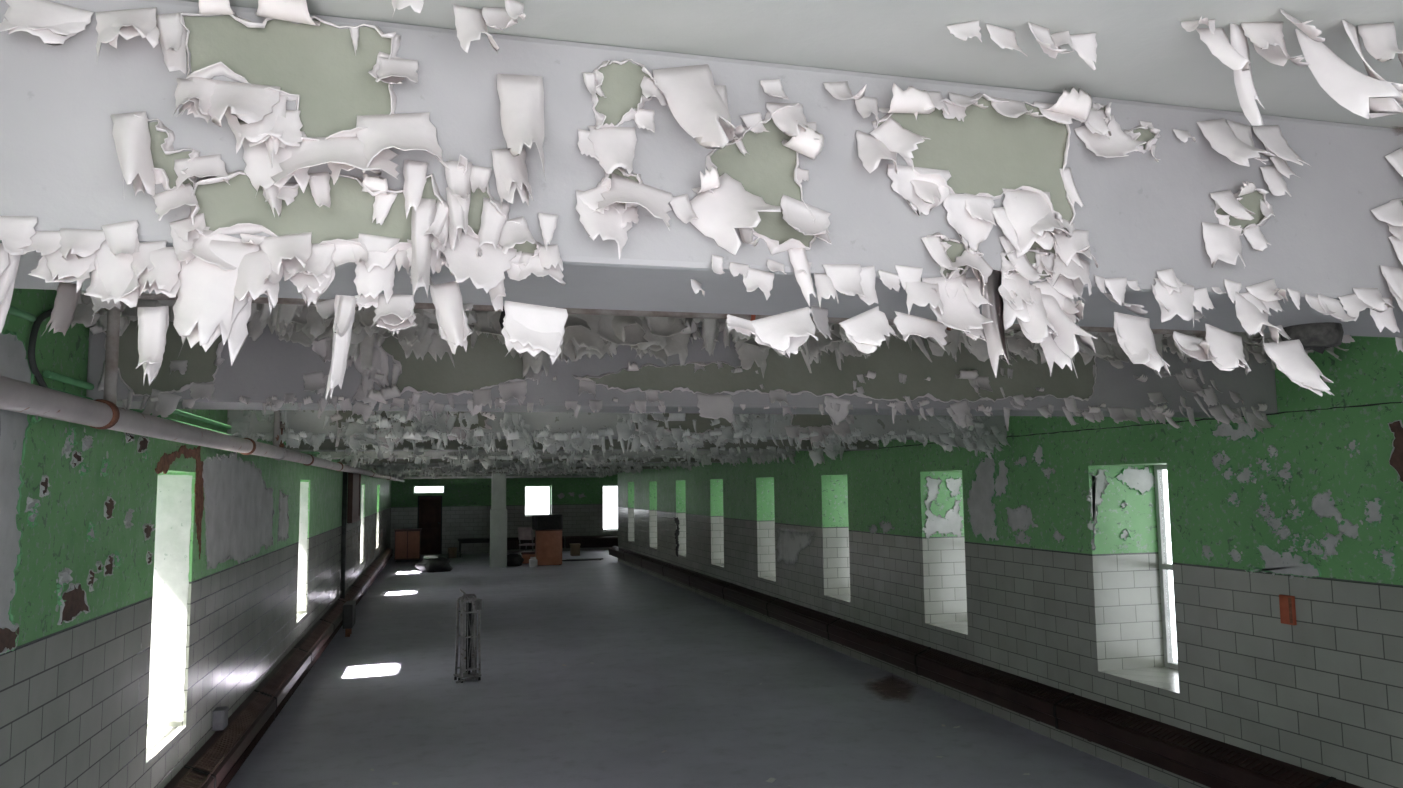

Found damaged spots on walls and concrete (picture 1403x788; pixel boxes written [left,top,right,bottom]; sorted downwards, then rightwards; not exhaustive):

peeling [0,0,1403,581]
peeling [0,409,51,654]
flaking render [54,550,122,625]
corrosion [155,445,204,560]
peeling [87,452,309,724]